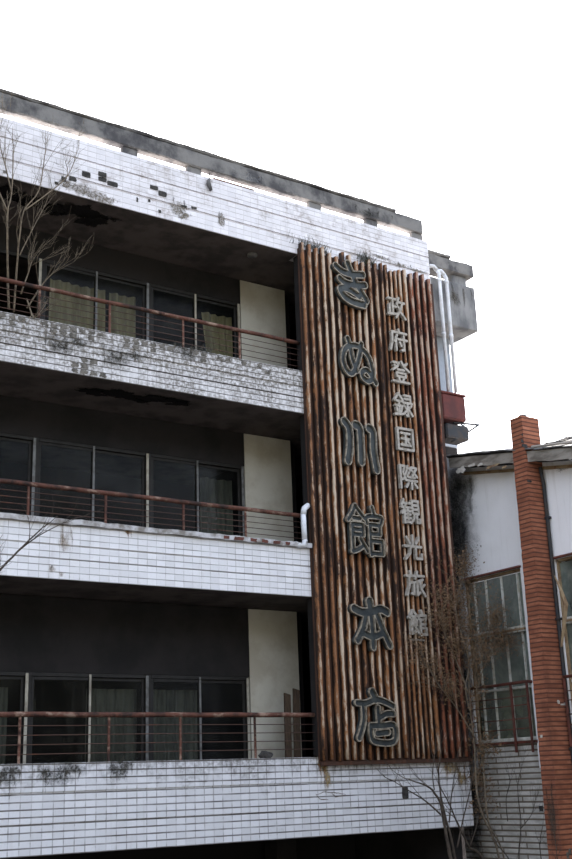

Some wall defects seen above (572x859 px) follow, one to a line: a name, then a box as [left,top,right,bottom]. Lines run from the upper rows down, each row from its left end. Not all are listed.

peeling [0,170,121,227]
mould [45,332,84,352]
mould [449,476,472,594]
mould [40,764,81,782]
damp [108,758,132,778]